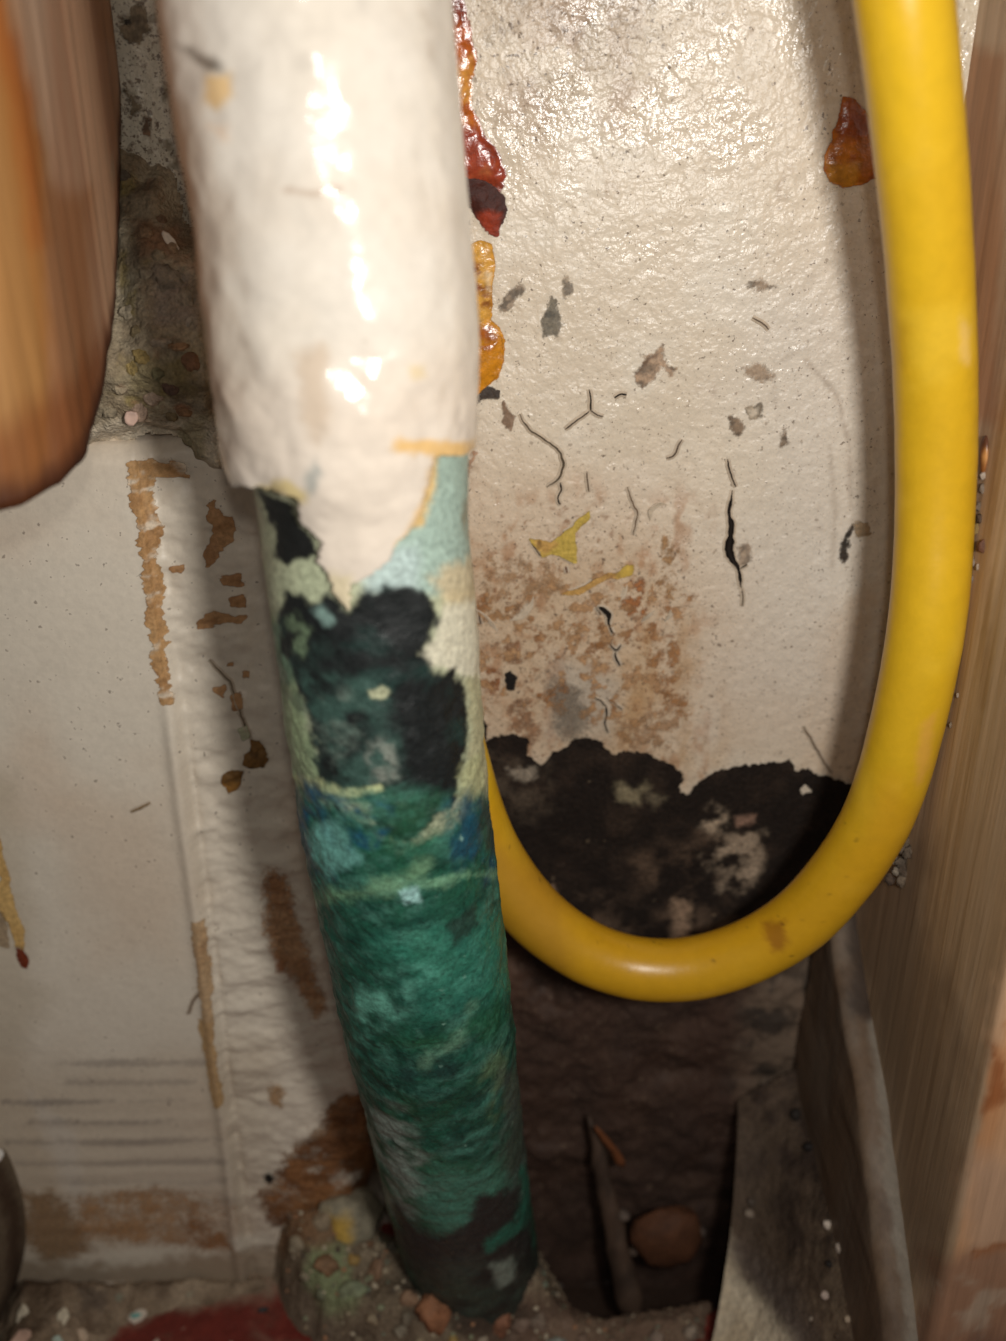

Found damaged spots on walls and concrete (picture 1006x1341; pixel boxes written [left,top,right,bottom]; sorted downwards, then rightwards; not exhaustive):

rust [824,96,875,188]
rust [453,0,508,394]
peeling [541,277,573,337]
peeling [478,387,516,431]
crack [518,389,627,506]
peeling [634,344,677,388]
crack [625,486,640,536]
crack [722,459,749,606]
peeling [221,739,269,794]
damp [476,536,851,938]
damp [268,1086,285,1108]
damp [253,1094,377,1227]